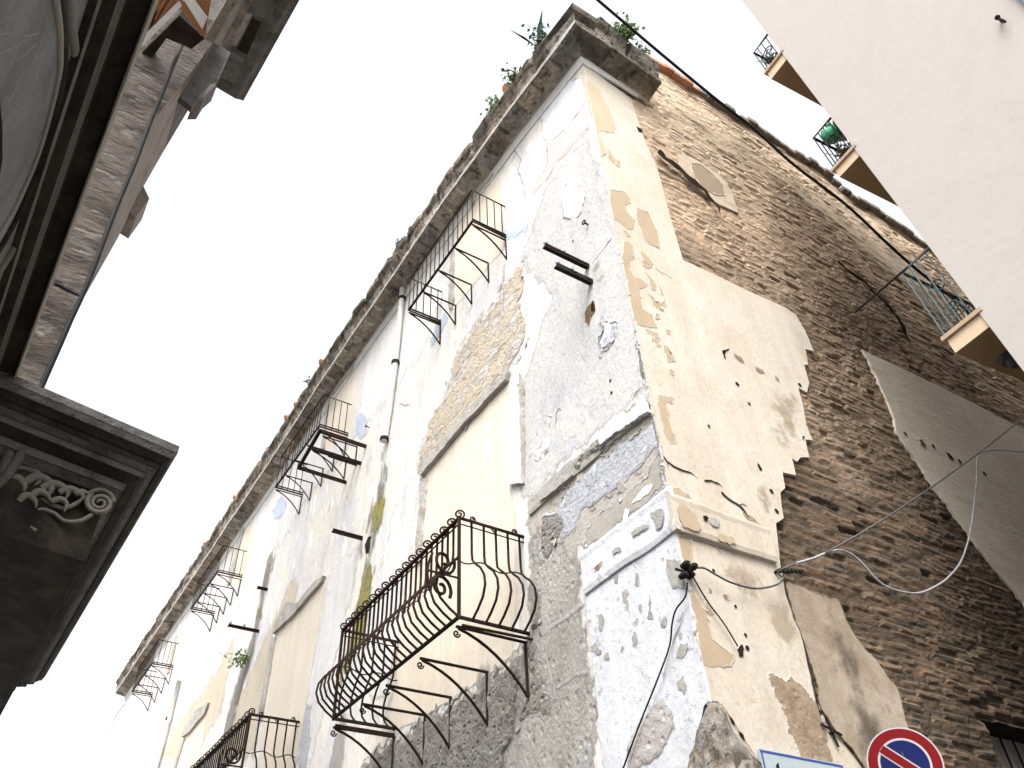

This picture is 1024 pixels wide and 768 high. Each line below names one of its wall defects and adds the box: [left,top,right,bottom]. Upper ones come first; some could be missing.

crack [657,149,721,215]
peeling [691,163,726,196]
crack [838,260,911,344]
peeling [416,250,530,472]
peeling [537,189,749,669]
spalling [903,431,962,464]
crack [663,456,748,516]
damp [353,465,387,617]
peeling [627,699,674,768]
peeling [676,675,687,694]
peeling [768,672,834,763]